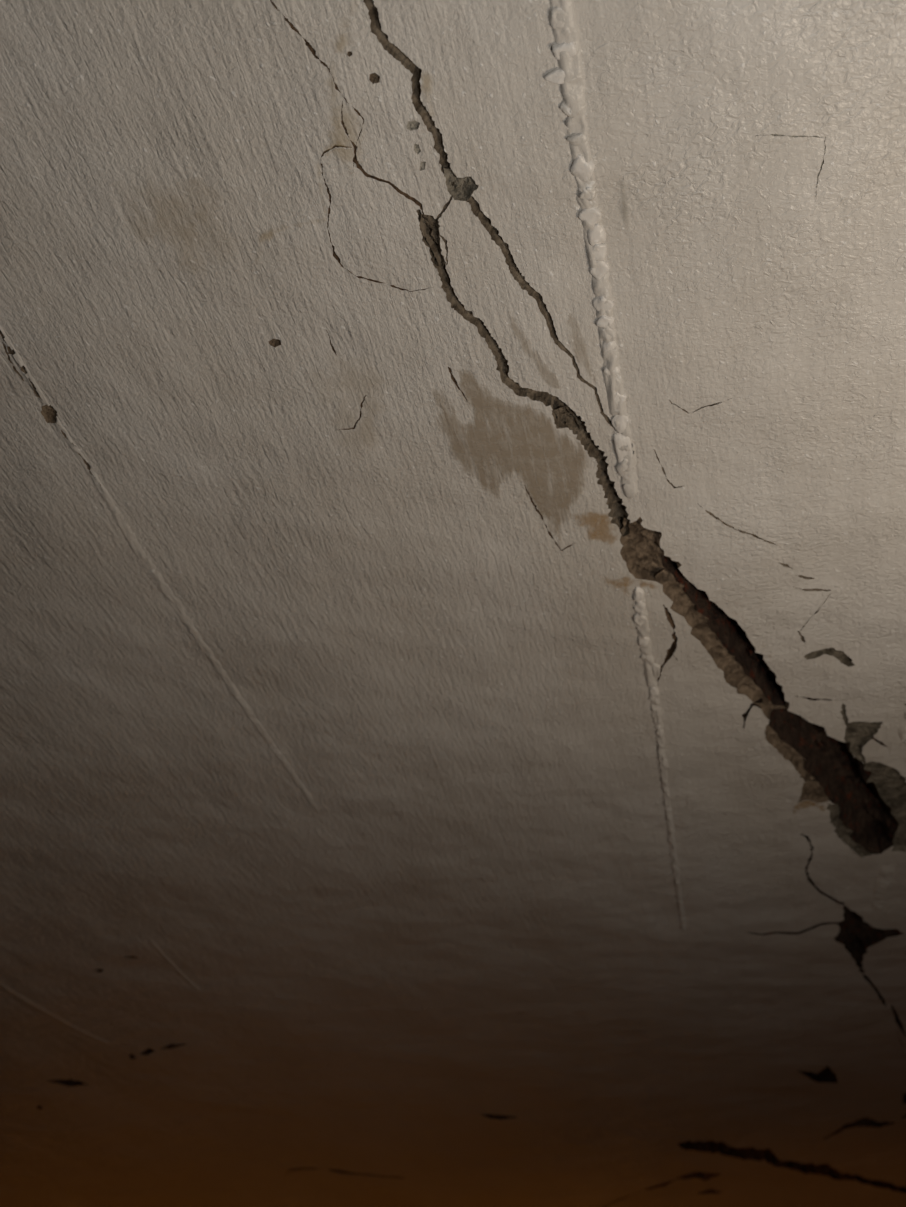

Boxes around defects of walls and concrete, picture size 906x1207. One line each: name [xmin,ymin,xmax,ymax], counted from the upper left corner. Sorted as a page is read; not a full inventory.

peeling [544,0,638,499]
crack [270,0,906,858]
peeling [798,631,855,667]
peeling [632,587,686,932]
spalling [747,834,906,1045]
crack [128,1044,186,1059]
crack [604,1115,906,1207]